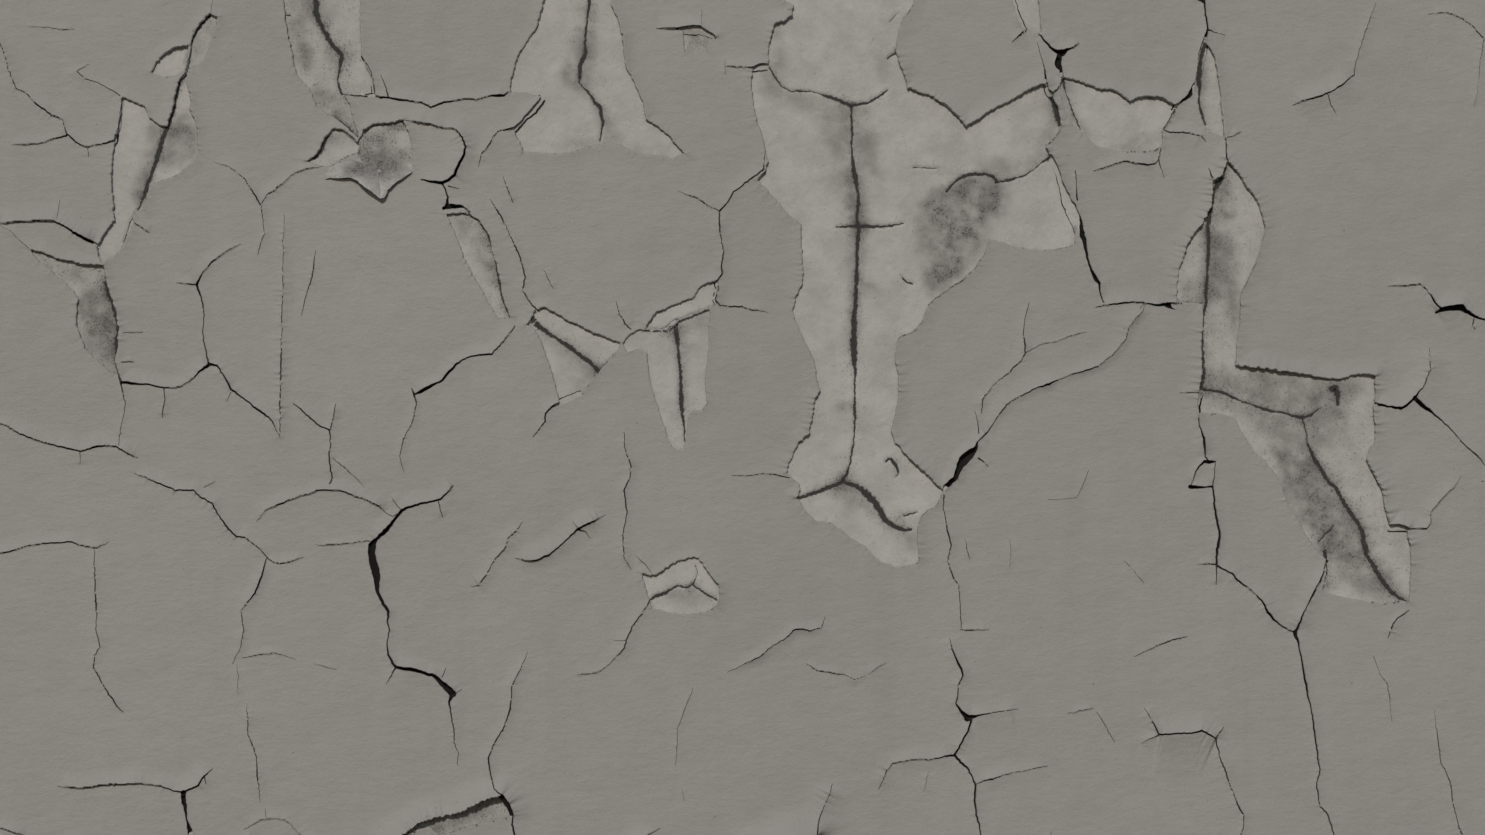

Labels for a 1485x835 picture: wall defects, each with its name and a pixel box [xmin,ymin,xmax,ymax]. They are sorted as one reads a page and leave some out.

crack [0,29,123,157]
peeling [24,6,226,381]
crack [0,56,545,835]
peeling [367,773,531,835]
peeling [275,0,725,450]
crack [577,433,652,676]
crack [679,152,766,312]
crack [727,618,886,675]
crack [874,0,1241,835]
peeling [741,0,1422,607]
crack [1180,388,1339,835]
crack [1373,349,1485,533]